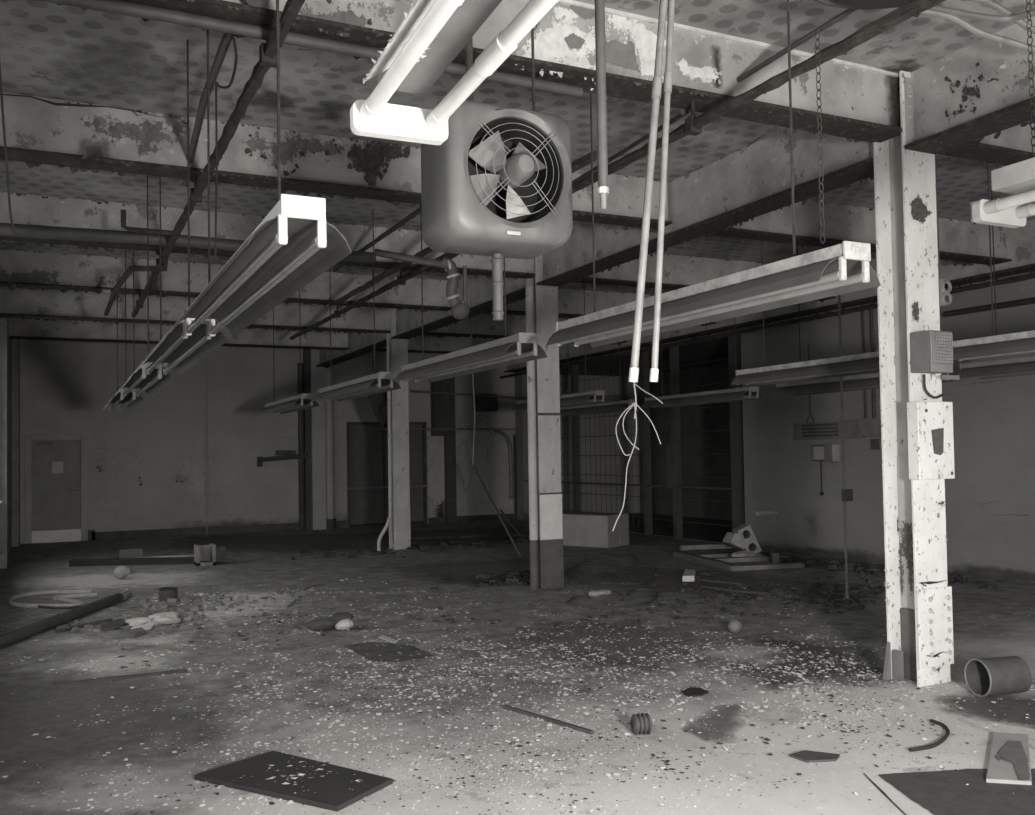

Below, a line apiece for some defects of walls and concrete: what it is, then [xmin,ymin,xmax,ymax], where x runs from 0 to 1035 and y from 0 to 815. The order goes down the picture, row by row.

peeling [515,5,723,91]
crack [3,94,190,125]
peeling [81,115,185,157]
spalling [241,129,411,186]
spalling [944,61,1011,125]
peeling [905,195,932,224]